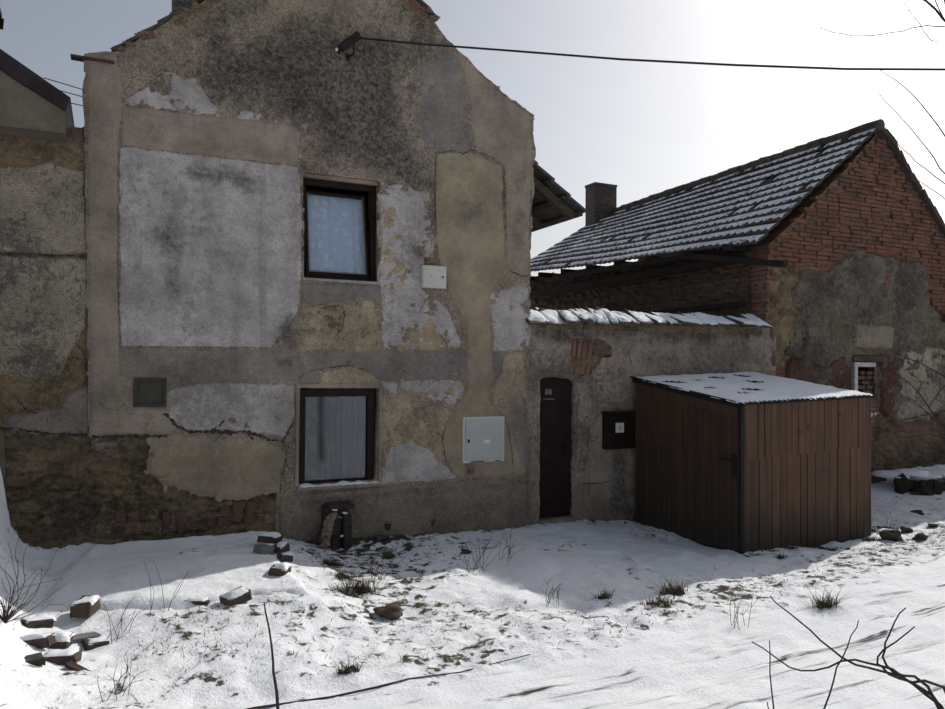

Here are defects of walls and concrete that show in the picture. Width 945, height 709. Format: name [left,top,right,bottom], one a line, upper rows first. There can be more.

peeling [125,72,220,117]
peeling [237,111,262,120]
peeling [301,182,466,353]
peeling [765,249,945,424]
peeling [3,386,89,436]
peeling [377,379,465,484]
peeling [570,337,612,483]